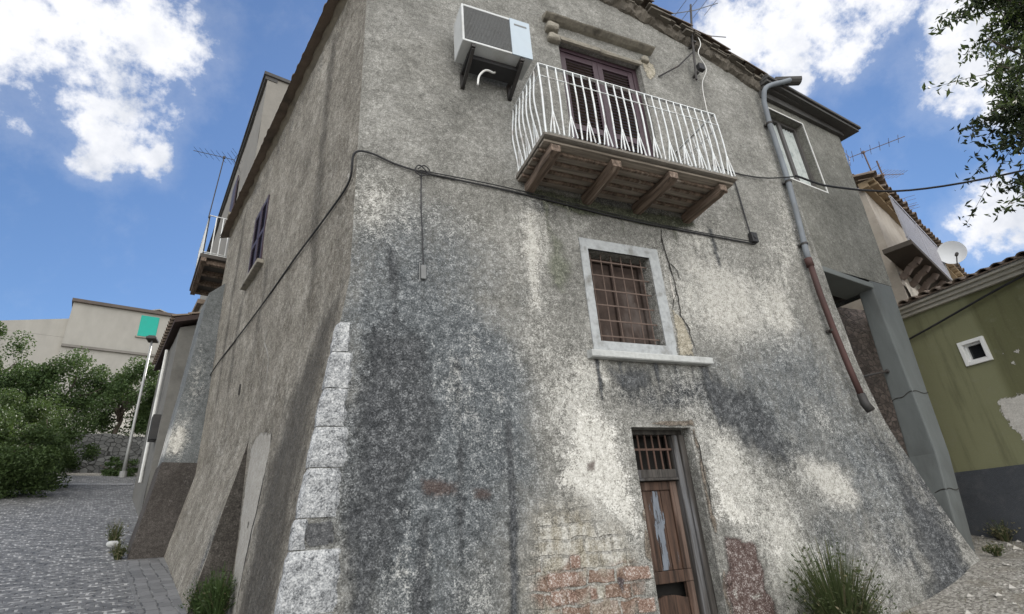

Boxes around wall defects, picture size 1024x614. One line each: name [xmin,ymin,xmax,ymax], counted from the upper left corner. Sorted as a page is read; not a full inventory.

damp [388,250,400,322]
crack [660,227,696,350]
damp [343,330,440,614]
damp [505,420,520,614]
flaking render [518,495,656,614]
peeling [639,419,778,614]
peeling [998,393,1024,440]